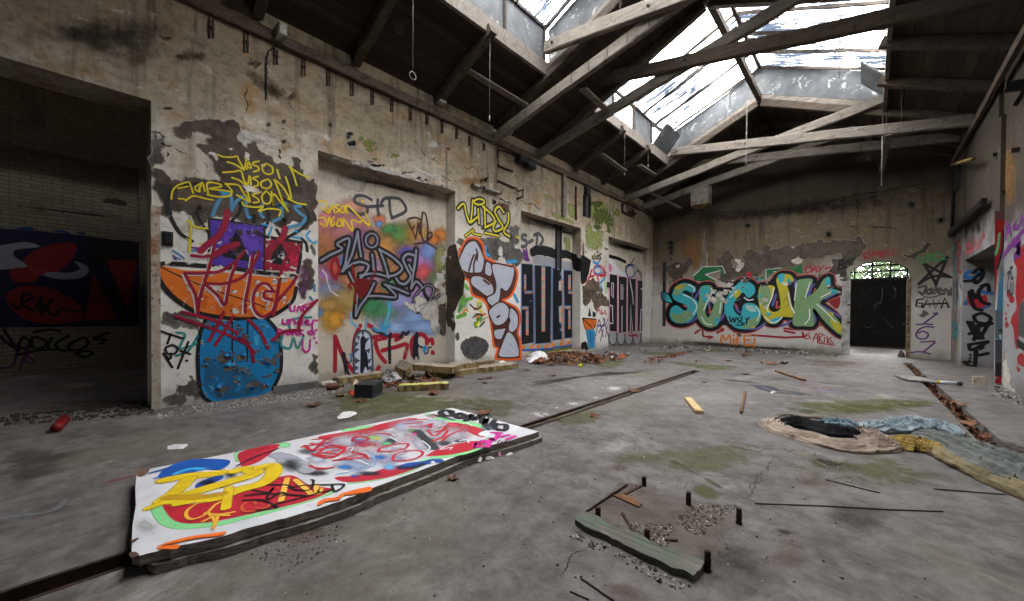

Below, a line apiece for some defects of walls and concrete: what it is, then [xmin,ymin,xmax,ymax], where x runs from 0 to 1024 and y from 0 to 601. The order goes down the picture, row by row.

water stain [63,23,138,54]
spalling [147,117,319,257]
spalling [705,231,867,309]
peeling [161,243,316,407]
crack [560,412,795,517]